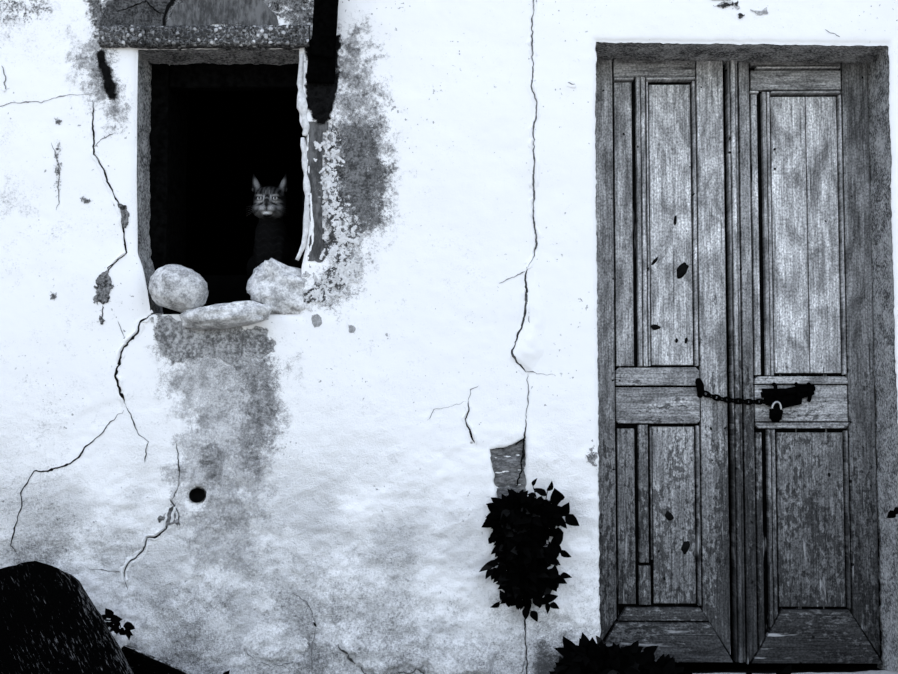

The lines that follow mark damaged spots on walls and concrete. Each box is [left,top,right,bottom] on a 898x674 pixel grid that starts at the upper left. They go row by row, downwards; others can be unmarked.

damp [0,0,49,24]
damp [73,0,129,133]
damp [262,0,314,32]
peeling [713,0,768,19]
crack [0,64,128,276]
damp [322,22,398,275]
crack [501,0,550,441]
crack [10,305,155,554]
crack [90,444,180,590]
damp [157,354,289,574]
crack [429,386,478,444]
spalling [490,436,527,498]